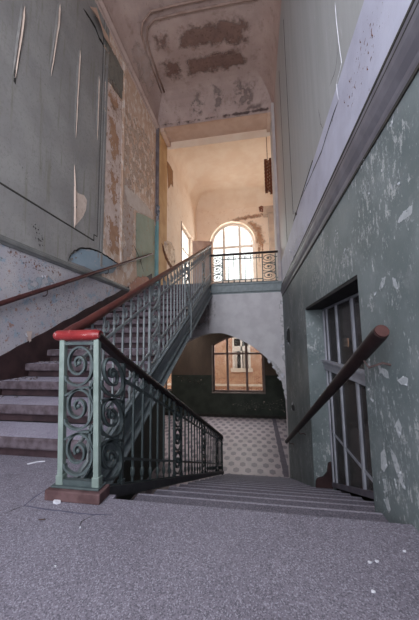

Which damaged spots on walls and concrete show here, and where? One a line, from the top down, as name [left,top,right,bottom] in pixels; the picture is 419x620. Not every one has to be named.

crack [13,2,26,84]
crack [49,1,61,75]
peeling [155,19,248,81]
crack [73,48,81,136]
crack [302,6,342,195]
peeling [68,81,154,274]
peeling [397,205,413,223]
peeling [368,276,399,312]